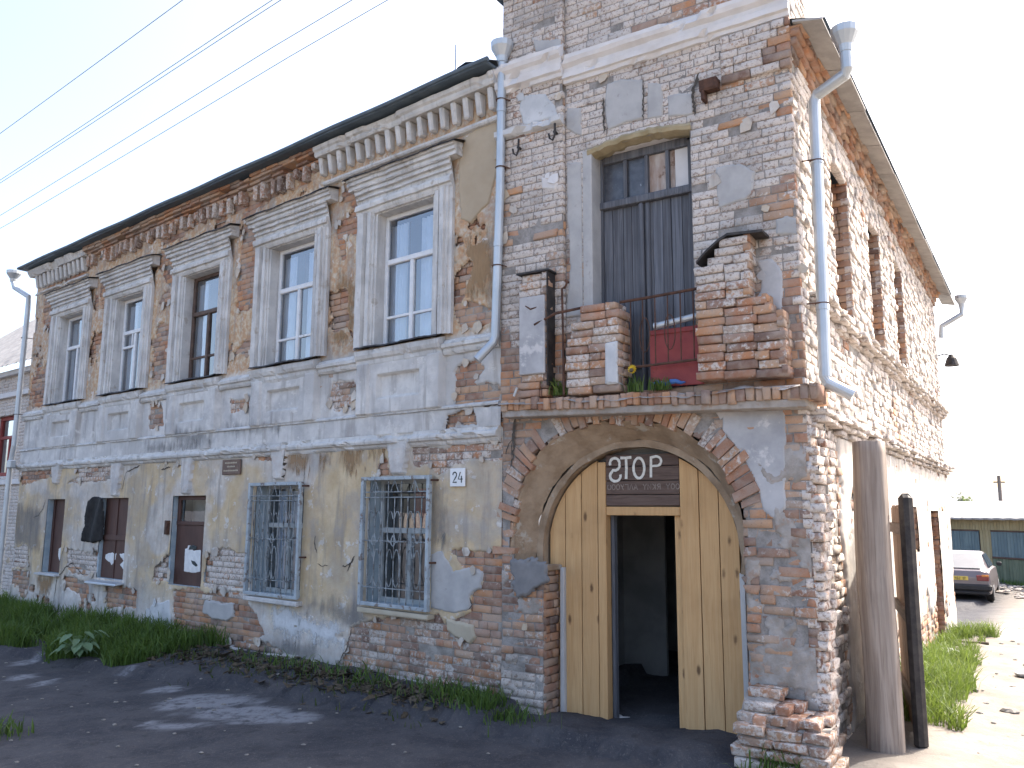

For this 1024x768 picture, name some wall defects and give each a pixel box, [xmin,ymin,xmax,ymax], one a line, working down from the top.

peeling [215,181,286,314]
peeling [334,173,357,260]
peeling [454,288,501,334]
peeling [28,356,47,409]
peeling [148,400,164,431]
peeling [230,393,249,414]
peeling [320,374,356,413]
peeling [413,358,503,481]
peeling [3,544,34,598]
peeling [61,547,150,618]
peeling [153,547,283,655]
peeling [339,545,502,695]